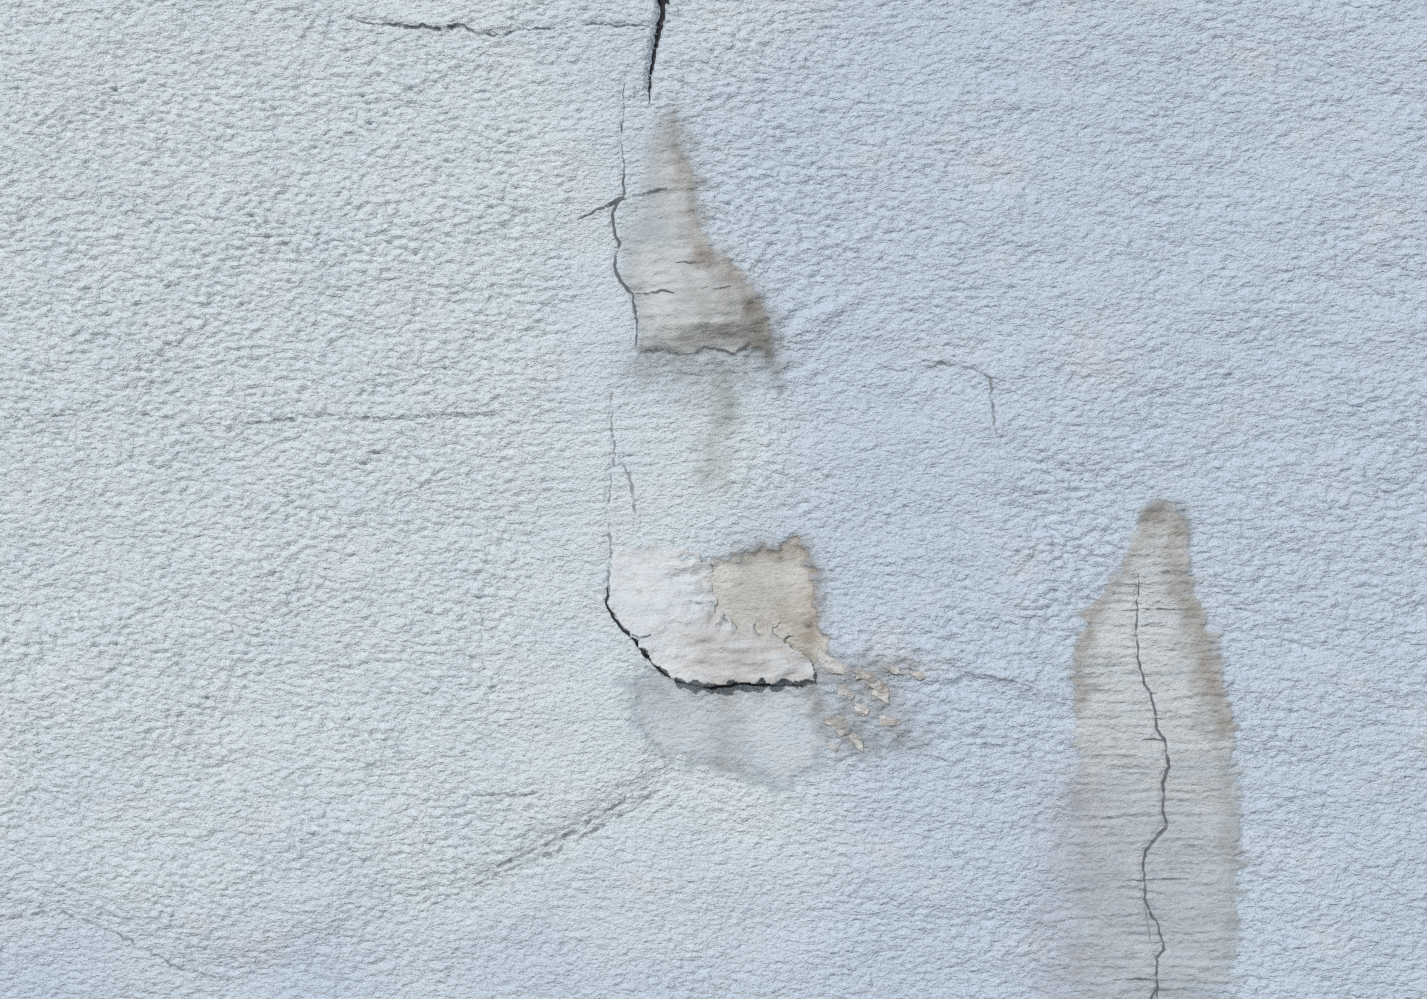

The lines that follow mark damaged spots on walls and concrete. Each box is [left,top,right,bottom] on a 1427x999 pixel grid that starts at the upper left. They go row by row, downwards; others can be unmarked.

crack [347,0,670,347]
crack [603,391,636,601]
peeling [605,536,830,792]
crack [1134,574,1171,999]